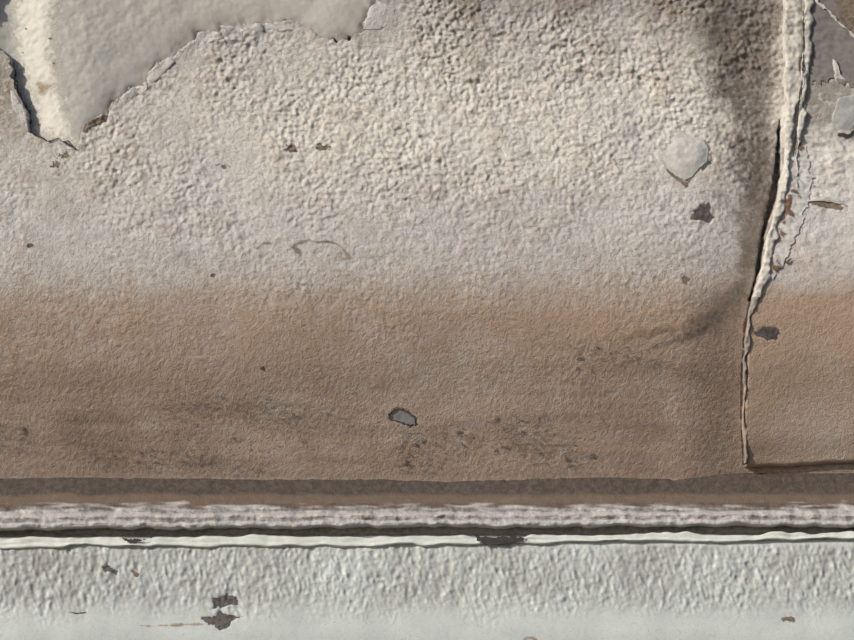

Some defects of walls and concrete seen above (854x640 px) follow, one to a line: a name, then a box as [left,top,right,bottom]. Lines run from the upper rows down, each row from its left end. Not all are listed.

peeling [0,0,395,168]
damp [702,0,781,271]
peeling [808,0,854,139]
peeling [691,203,714,223]
crack [740,0,854,464]
peeling [754,326,780,341]
peeling [389,408,418,427]
peeling [201,595,243,630]